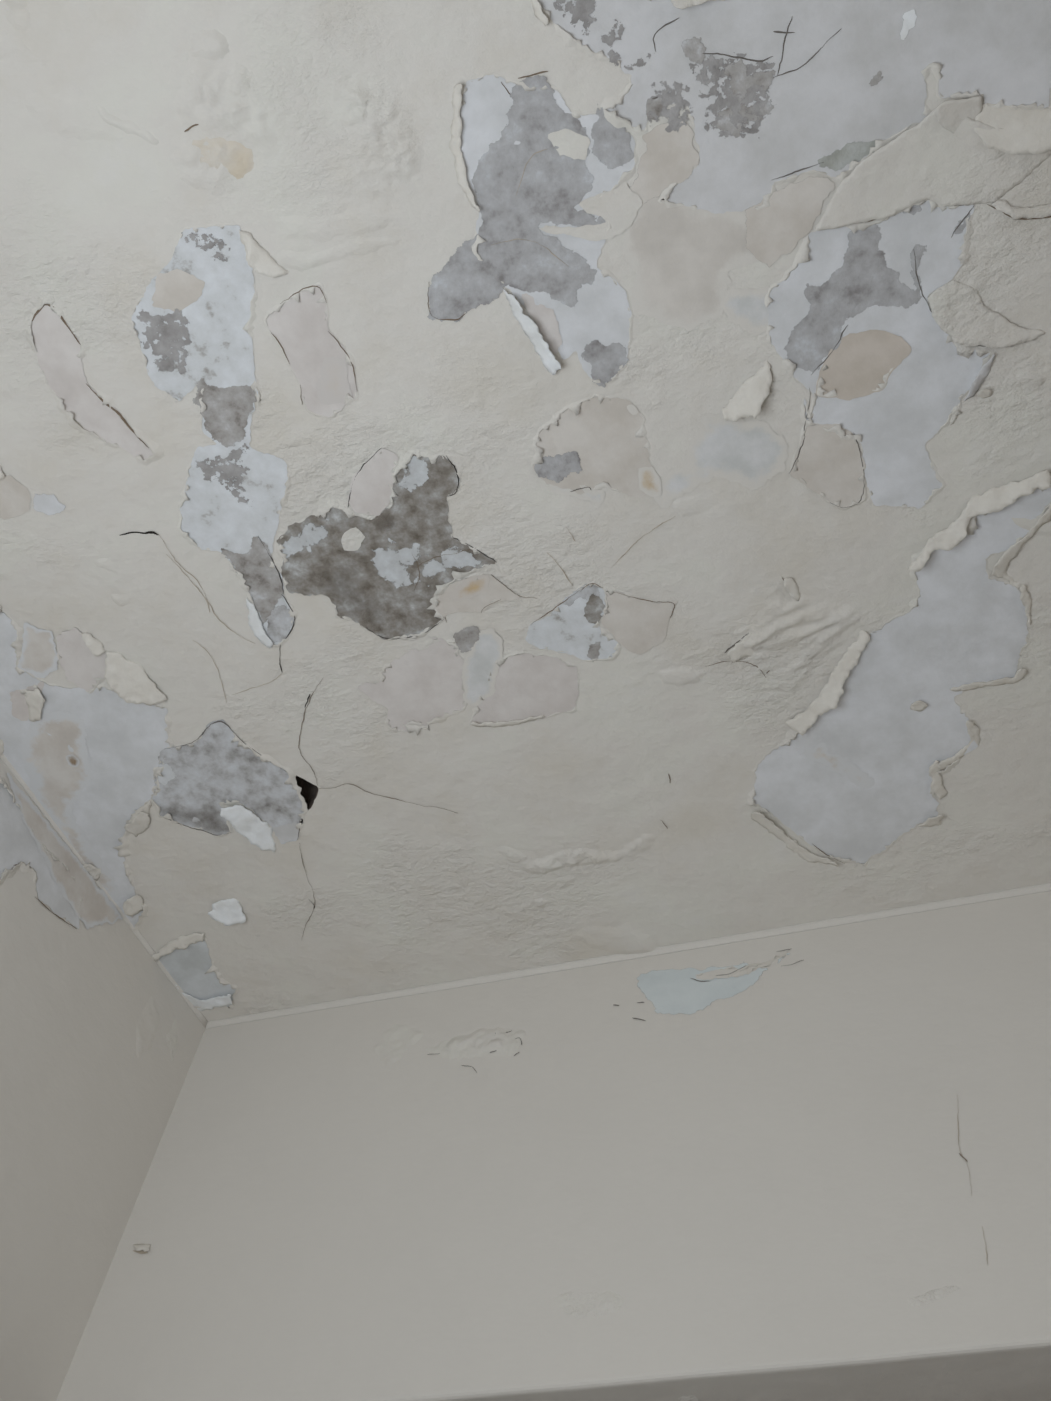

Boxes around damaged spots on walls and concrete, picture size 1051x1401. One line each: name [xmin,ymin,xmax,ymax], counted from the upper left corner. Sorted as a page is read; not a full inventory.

peeling [24,292,164,465]
flaking render [128,223,497,648]
peeling [427,0,1051,511]
peeling [0,605,318,930]
flaking render [524,581,678,662]
peeling [745,470,1051,867]
peeling [152,898,246,1011]